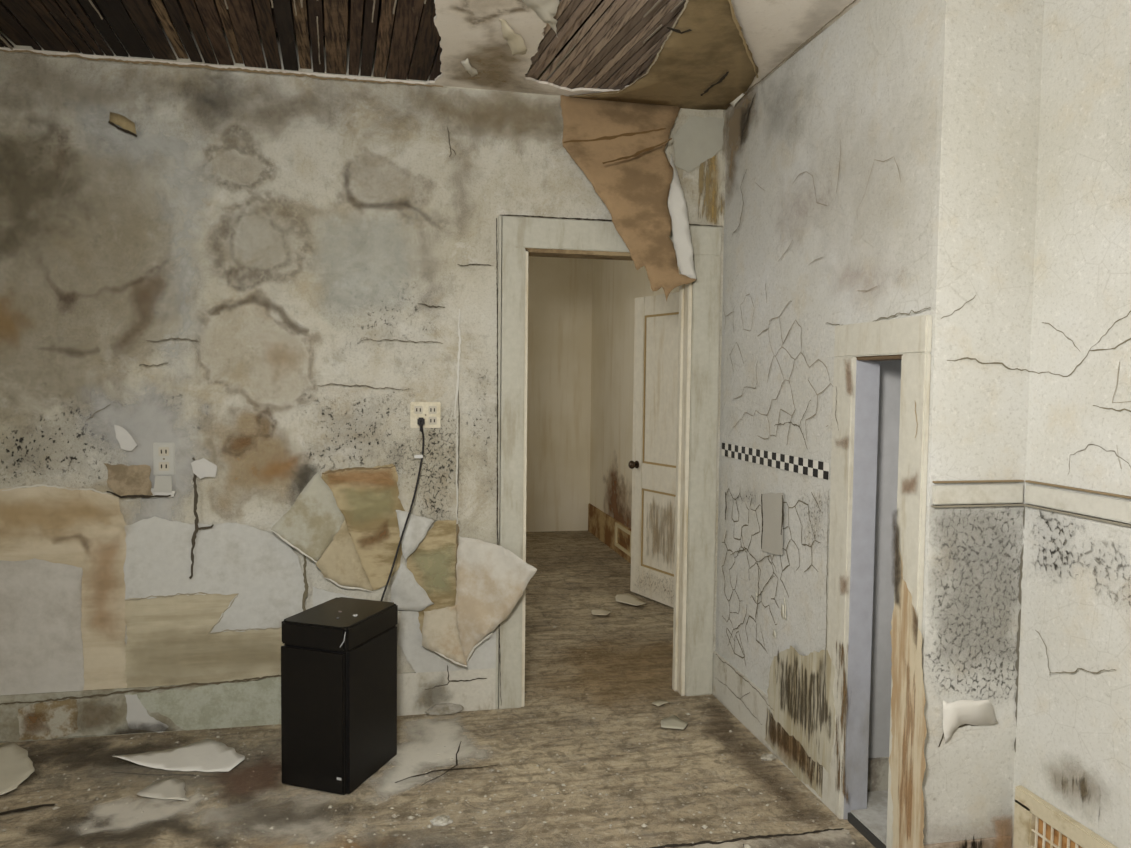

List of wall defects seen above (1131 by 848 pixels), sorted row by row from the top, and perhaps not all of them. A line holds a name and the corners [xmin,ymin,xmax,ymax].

peeling [461,58,478,77]
spalling [499,0,686,90]
crack [723,283,843,447]
crack [947,311,1131,412]
damp [1,409,110,479]
flaking render [0,391,284,740]
crack [189,457,214,579]
flaking render [271,464,537,667]
damp [608,472,631,529]
crack [716,488,828,725]
damp [929,513,1019,697]
damp [1034,511,1131,604]